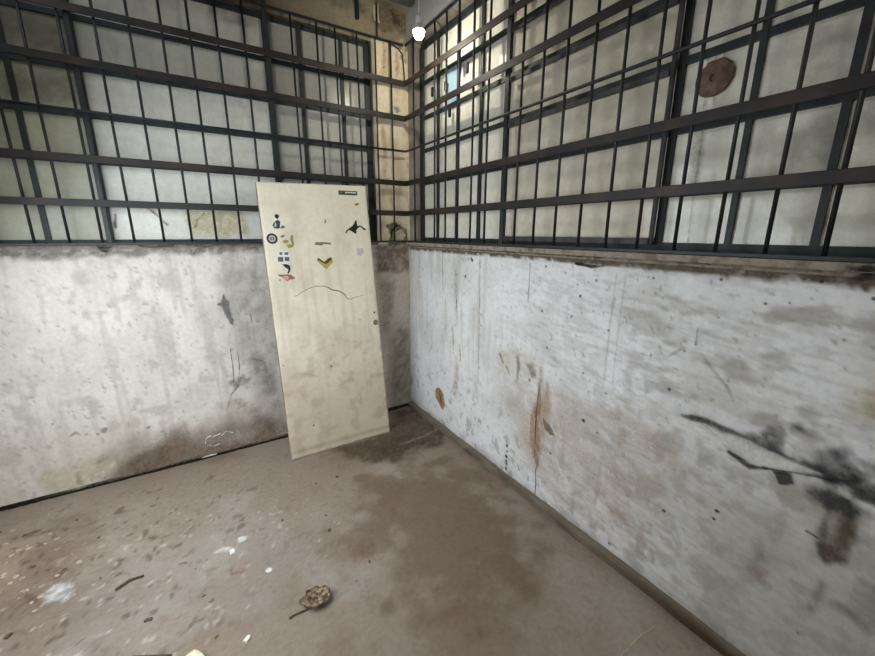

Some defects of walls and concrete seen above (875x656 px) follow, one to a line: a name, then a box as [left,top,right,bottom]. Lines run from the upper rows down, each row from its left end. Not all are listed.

rust [435,388,445,409]
rust [530,389,546,465]